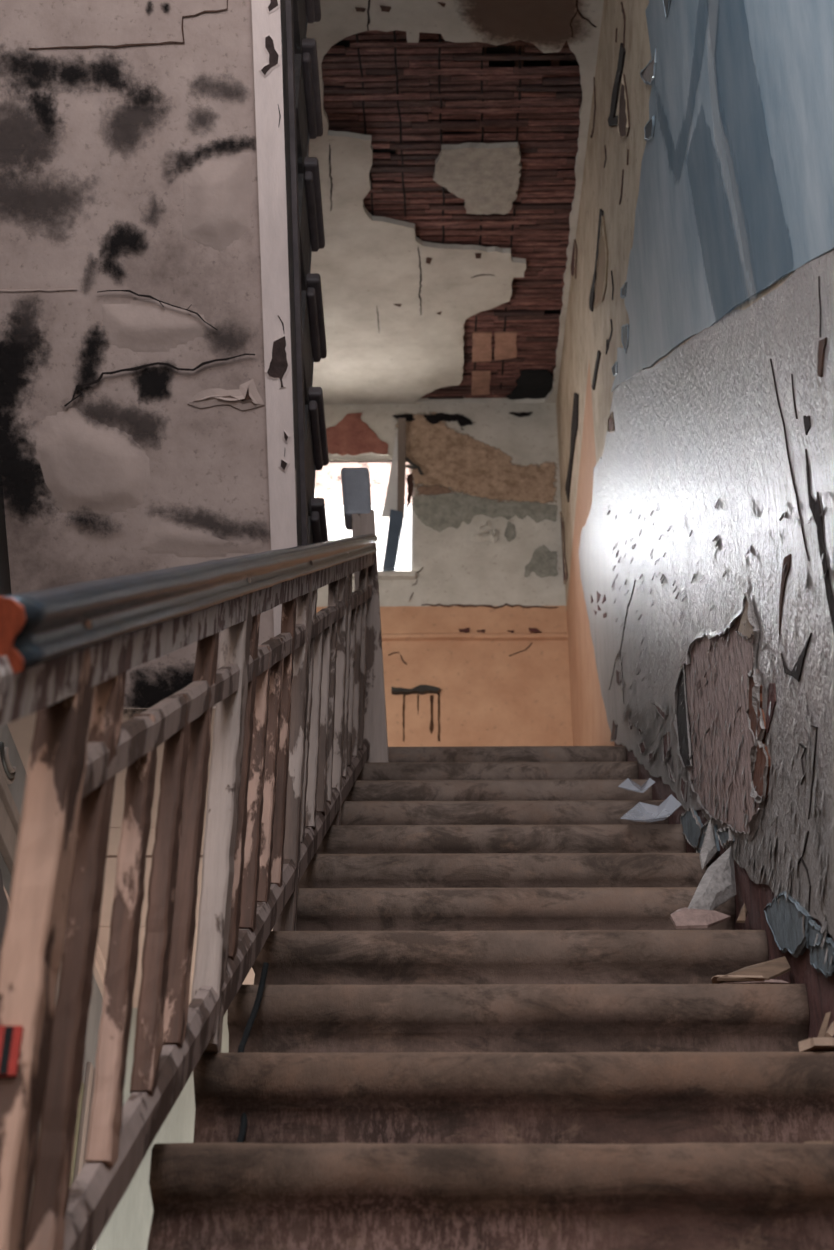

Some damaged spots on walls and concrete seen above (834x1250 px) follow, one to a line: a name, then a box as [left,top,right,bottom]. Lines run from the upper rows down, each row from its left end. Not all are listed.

crack [29,0,228,49]
damp [460,0,586,49]
damp [0,51,167,237]
damp [165,136,255,175]
damp [85,200,158,286]
damp [0,300,53,520]
damp [75,326,174,445]
crack [64,290,255,407]
flaking render [321,30,629,584]
peeling [817,337,827,377]
damp [159,509,268,539]
flaking render [591,416,834,981]